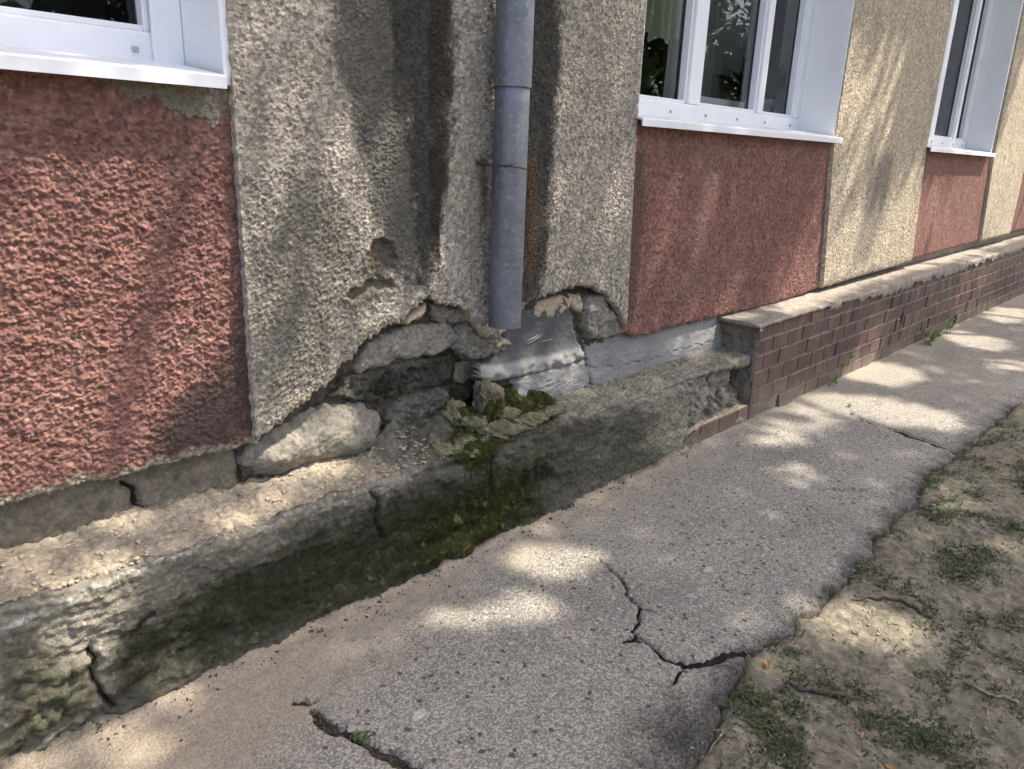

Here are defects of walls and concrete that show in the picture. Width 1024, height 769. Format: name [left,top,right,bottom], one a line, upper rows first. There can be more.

flaking render [88,77,229,129]
leakage [336,0,457,289]
leakage [522,0,564,307]
spalling [344,237,398,301]
spalling [525,286,624,360]
spalling [0,297,567,506]
crack [120,481,143,508]
crack [621,583,752,687]
crack [86,648,114,707]
crack [292,701,418,769]